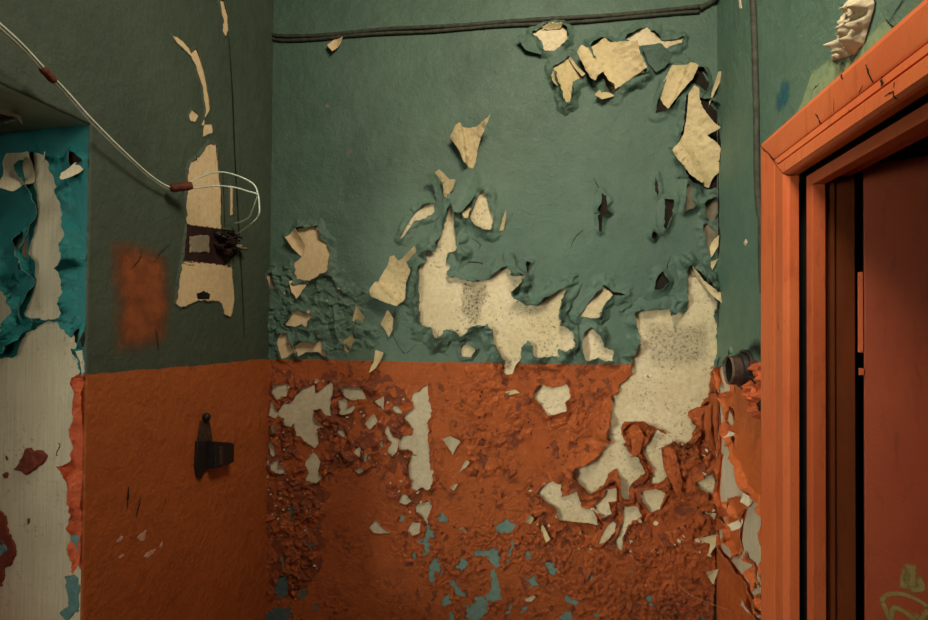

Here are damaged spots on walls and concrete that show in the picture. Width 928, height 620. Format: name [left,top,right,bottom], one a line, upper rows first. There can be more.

peeling [0,138,89,620]
flaking render [170,32,239,319]
peeling [217,0,229,39]
peeling [264,18,761,620]